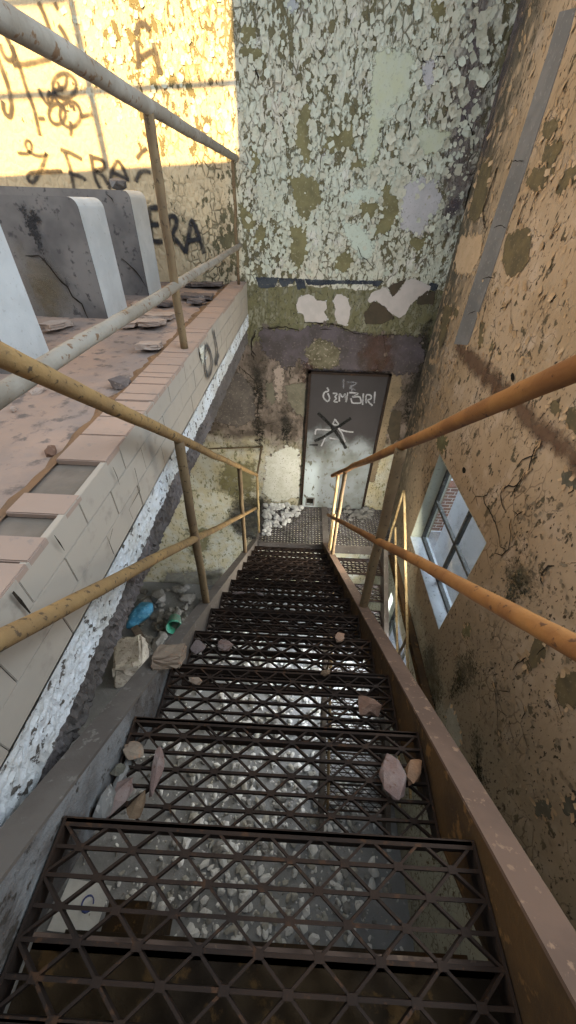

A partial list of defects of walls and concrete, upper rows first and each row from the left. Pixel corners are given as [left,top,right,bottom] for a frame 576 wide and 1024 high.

damp [19,206,57,296]
crack [26,255,88,318]
flaking render [59,0,576,483]
damp [218,462,256,503]
damp [278,411,293,443]
crack [472,440,553,556]
peeling [481,465,576,620]
peeling [445,600,576,861]